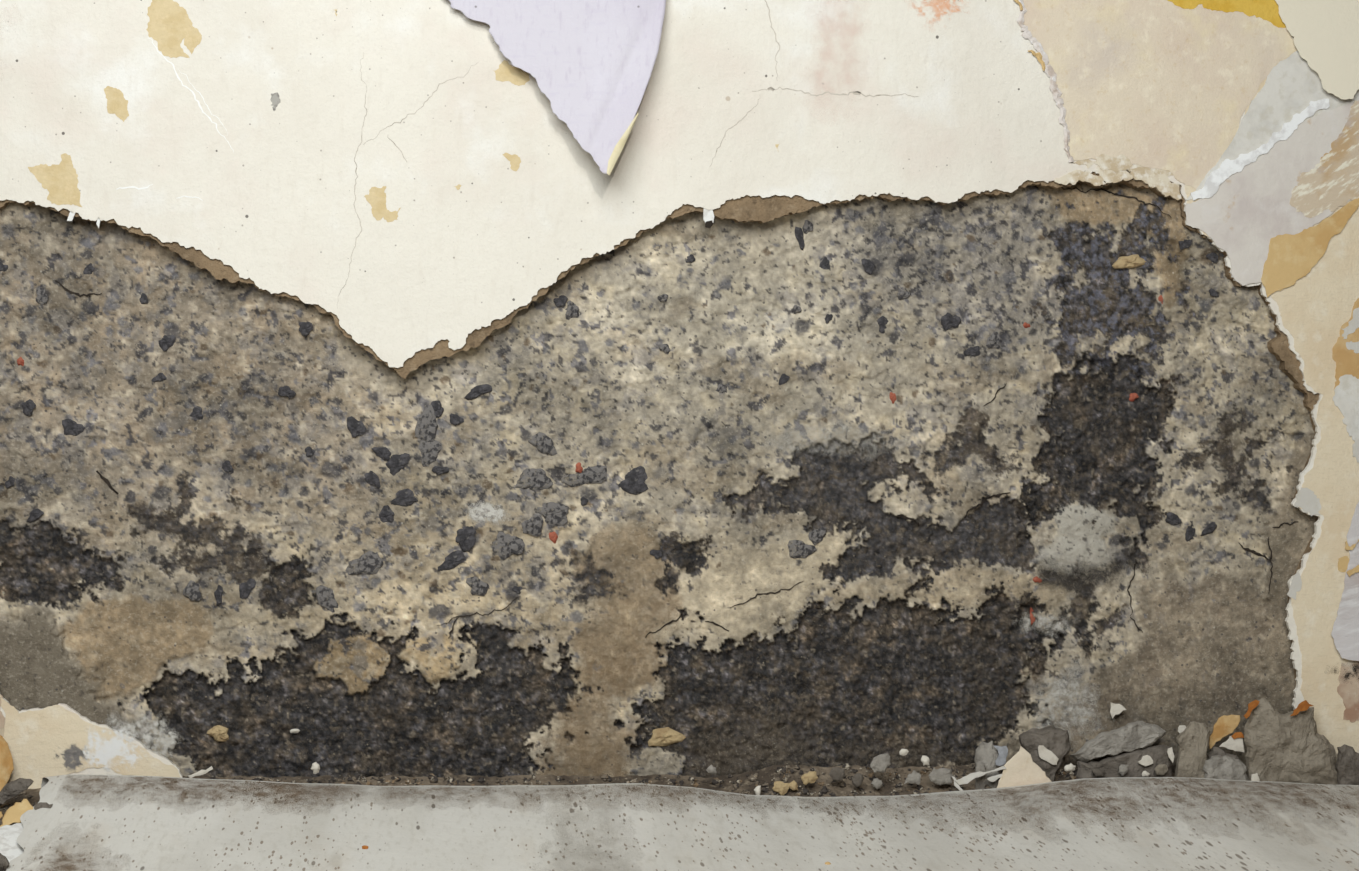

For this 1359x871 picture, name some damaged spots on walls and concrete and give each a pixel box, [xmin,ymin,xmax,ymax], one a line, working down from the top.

peeling [495,60,530,86]
leakage [753,419,912,461]
flaking render [0,153,1319,791]
efflorescence [1012,612,1081,638]
leakage [533,529,683,777]
peeling [0,799,33,827]